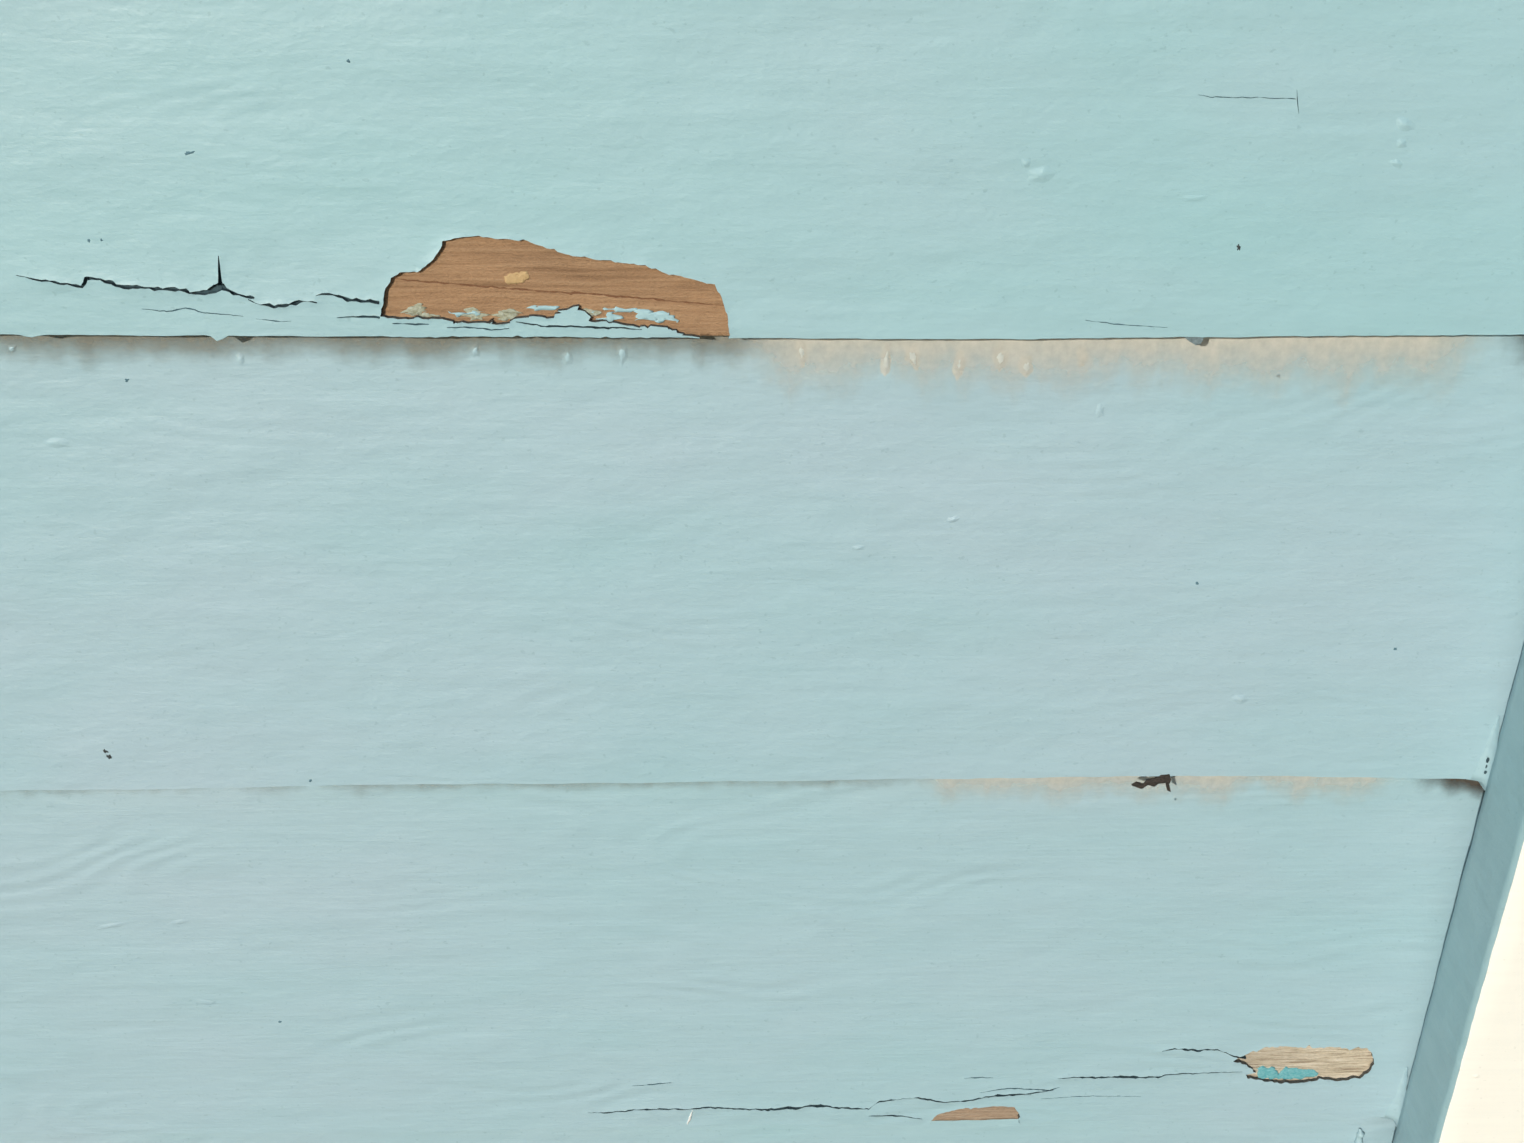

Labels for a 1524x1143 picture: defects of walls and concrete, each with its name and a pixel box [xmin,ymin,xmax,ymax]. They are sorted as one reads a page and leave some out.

crack [16,256,642,331]
peeling [380,236,730,338]
crack [593,1048,1246,1119]
peeling [932,1096,1020,1121]
peeling [1232,1045,1374,1084]